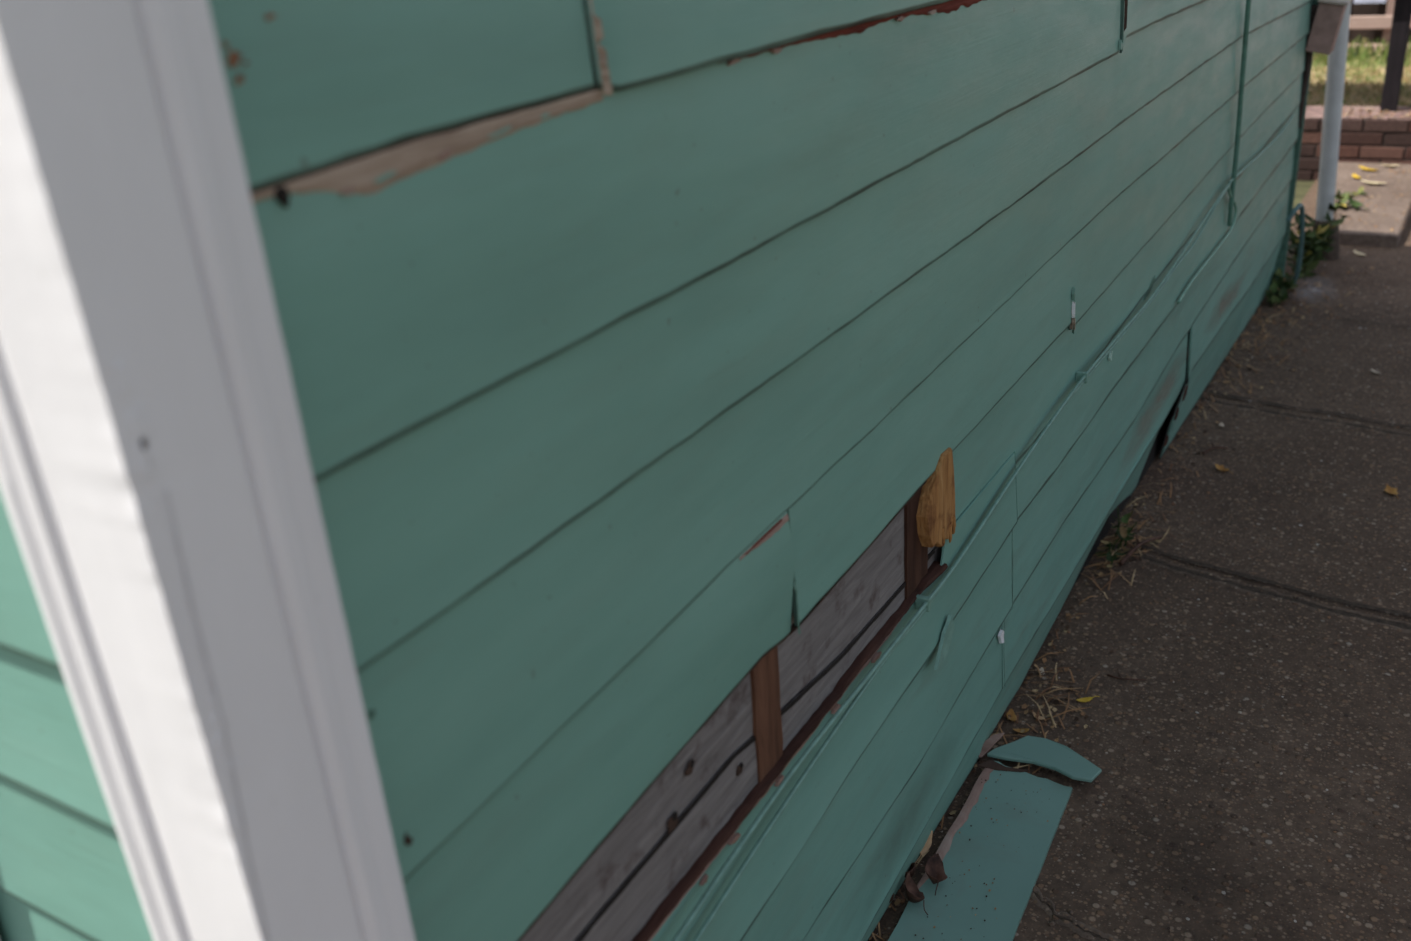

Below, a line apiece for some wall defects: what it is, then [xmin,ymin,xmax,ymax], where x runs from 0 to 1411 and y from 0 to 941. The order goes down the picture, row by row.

peeling [718,0,982,66]
peeling [250,86,603,208]
peeling [740,514,789,560]